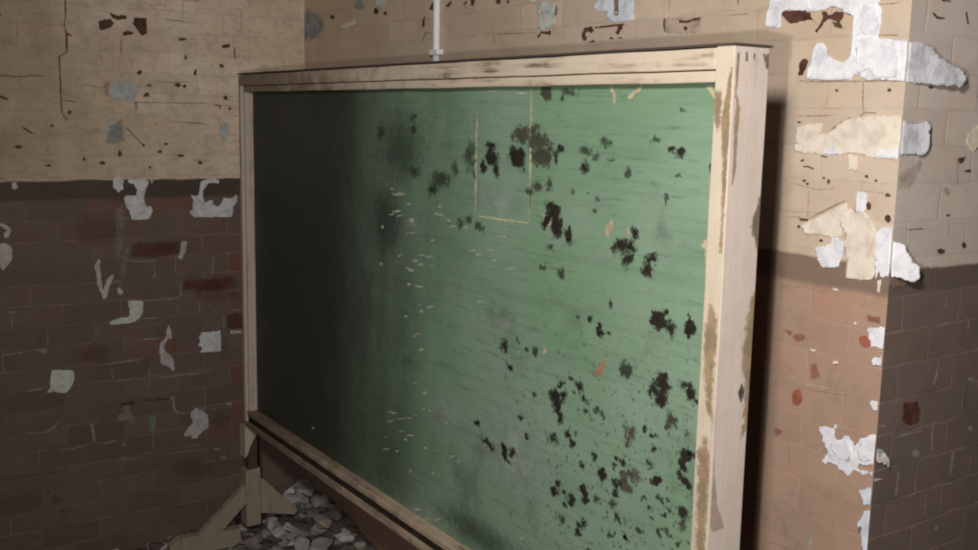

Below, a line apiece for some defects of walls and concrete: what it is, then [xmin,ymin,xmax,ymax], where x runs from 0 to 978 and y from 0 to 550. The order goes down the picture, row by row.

crack [59,0,72,119]
peeling [529,0,558,38]
peeling [582,0,634,42]
peeling [765,0,967,92]
peeling [113,166,154,220]
peeling [190,177,238,218]
peeling [793,112,931,197]
peeling [0,223,13,270]
peeling [797,191,921,293]
peeling [25,256,233,393]
peeling [116,396,232,460]
peeling [817,424,899,550]